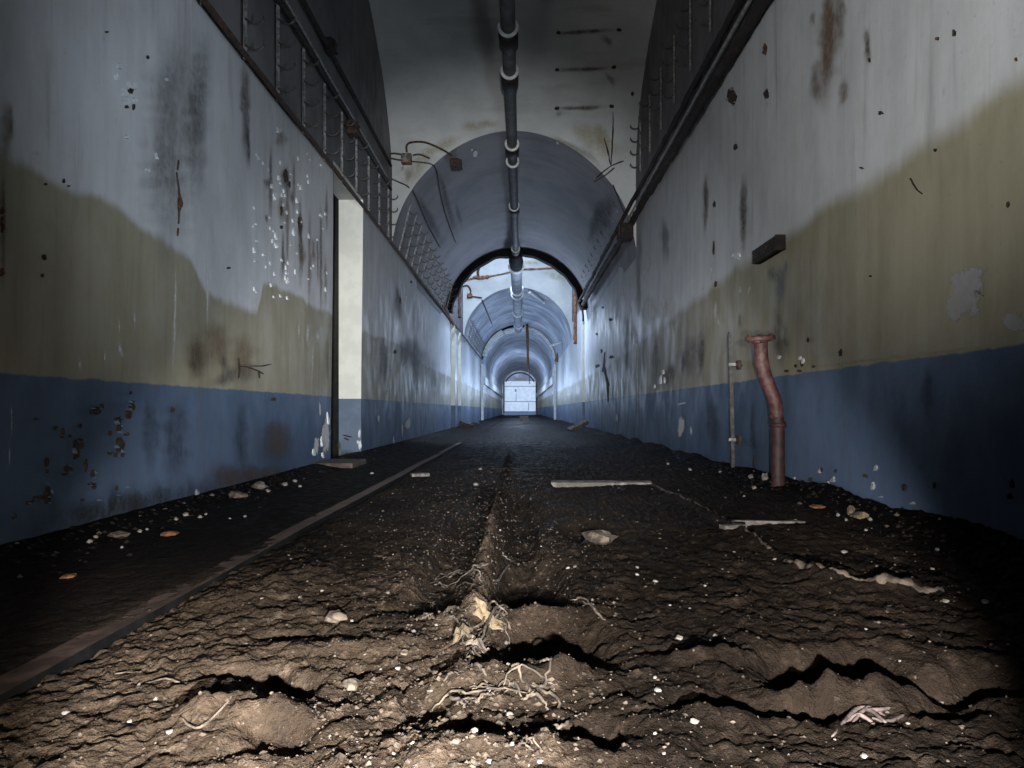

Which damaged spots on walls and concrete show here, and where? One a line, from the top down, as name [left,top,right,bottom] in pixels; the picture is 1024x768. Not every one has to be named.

peeling [252,153,328,300]
peeling [948,267,983,321]
peeling [107,391,136,457]
peeling [312,404,331,458]